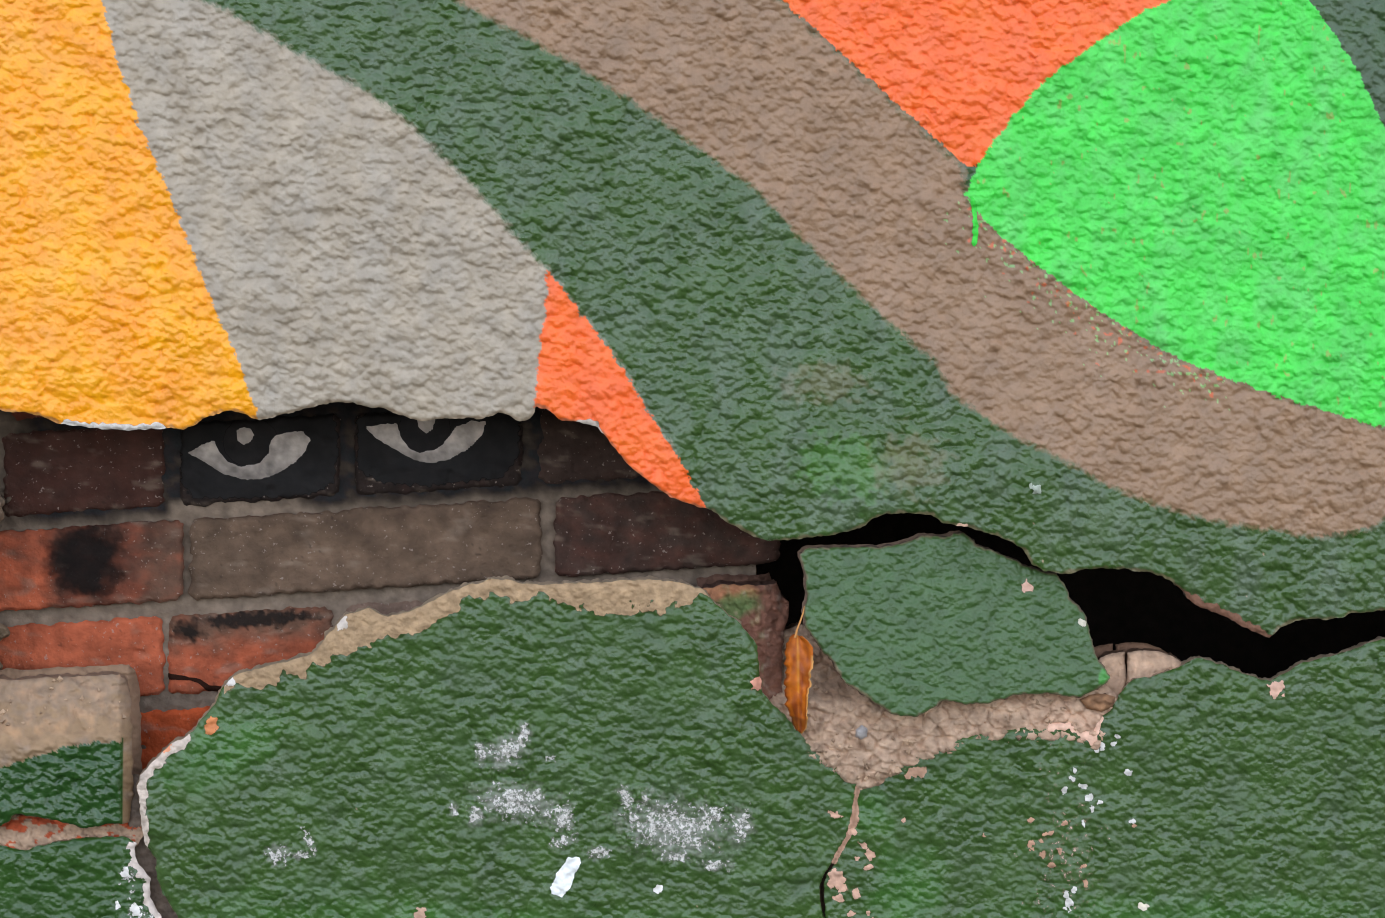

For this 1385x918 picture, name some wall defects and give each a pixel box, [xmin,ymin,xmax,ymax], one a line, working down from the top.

spalling [61,419,166,431]
spalling [577,419,603,433]
spalling [224,572,1121,790]
spalling [0,716,219,850]
damp [450,723,574,848]
damp [619,785,753,871]
crack [819,780,863,917]
peeling [1014,767,1103,913]